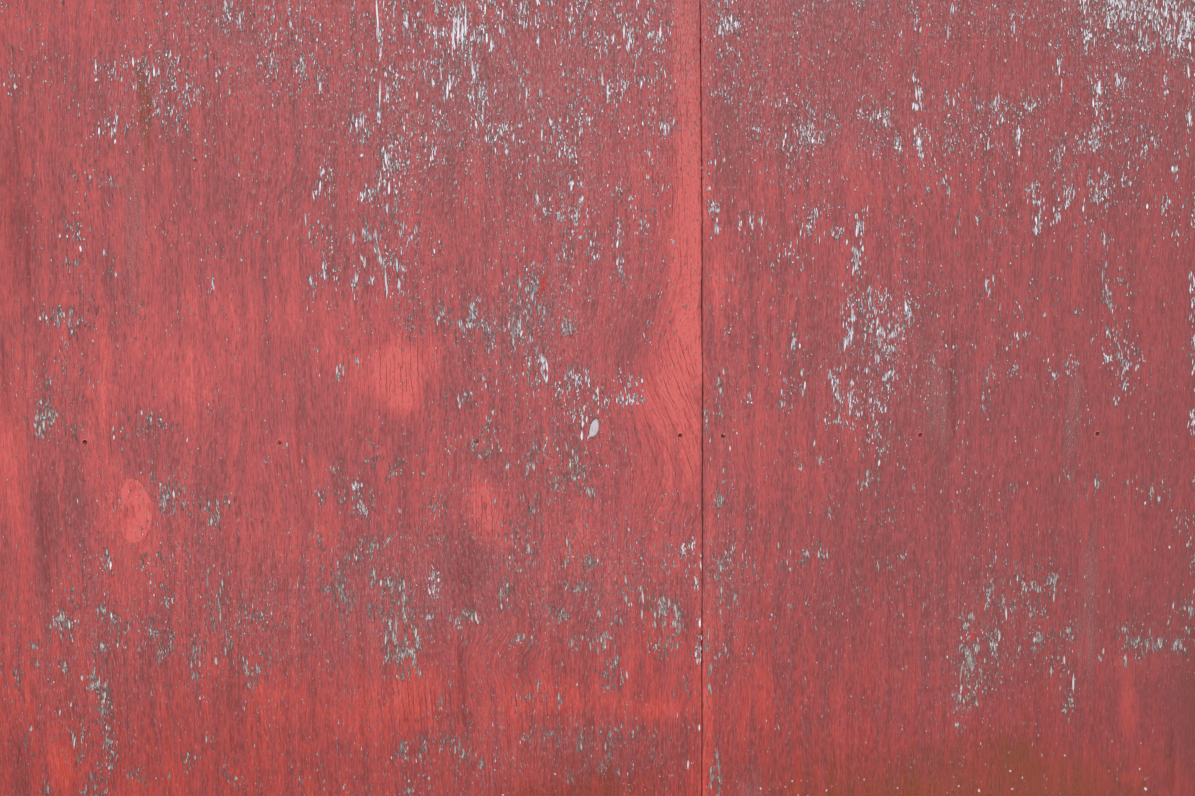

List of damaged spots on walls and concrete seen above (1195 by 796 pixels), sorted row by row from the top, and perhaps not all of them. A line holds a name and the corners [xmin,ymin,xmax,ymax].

peeling [76,42,246,149]
peeling [707,0,833,160]
peeling [26,158,121,442]
peeling [205,0,760,710]
peeling [724,191,1084,577]
peeling [851,0,1195,414]
peeling [1182,270,1195,451]
peeling [13,544,291,796]
peeling [151,471,235,531]
peeling [399,731,485,796]
peeling [939,543,1086,733]
peeling [1116,473,1195,669]